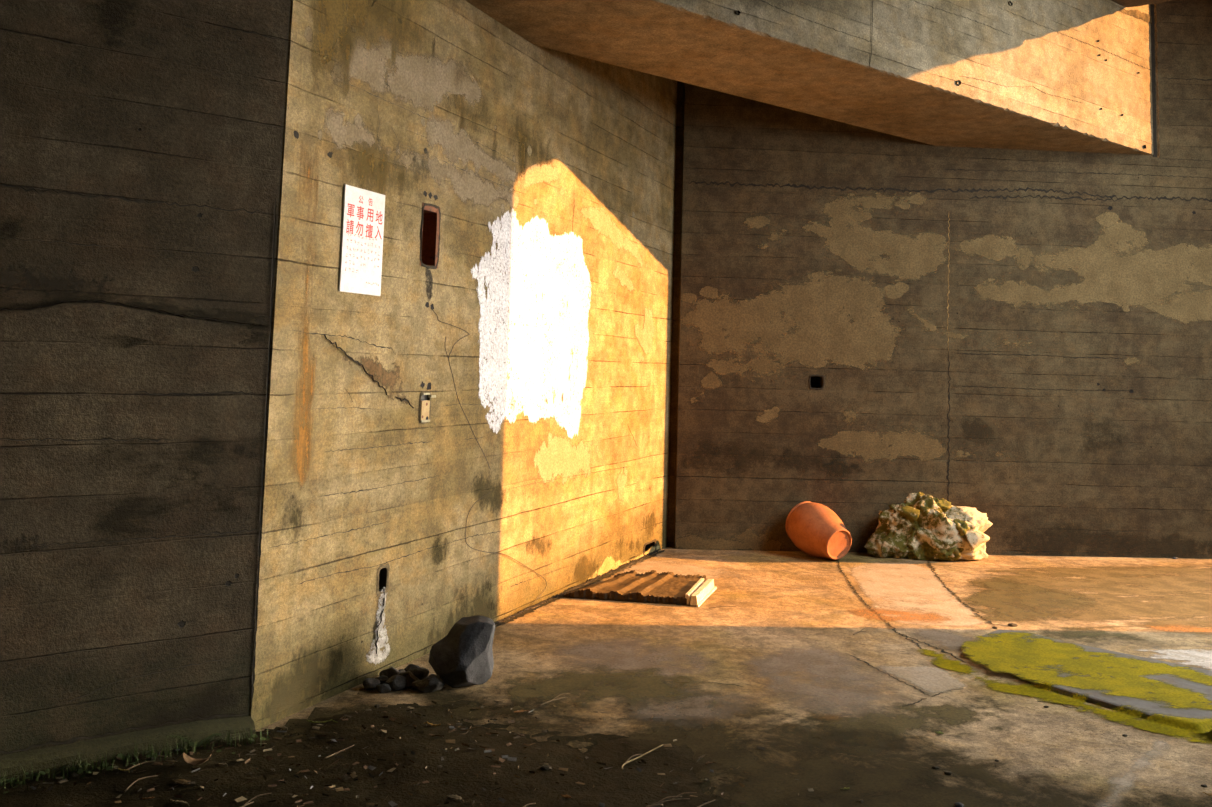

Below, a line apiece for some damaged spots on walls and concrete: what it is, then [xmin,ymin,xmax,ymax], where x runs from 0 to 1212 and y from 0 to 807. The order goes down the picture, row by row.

crack [0,299,264,326]
rust [291,314,314,487]
crack [293,330,392,349]
spalling [322,334,414,408]
peeling [755,406,780,423]
peeling [817,409,977,463]
peeling [681,190,1212,404]
crack [927,561,1006,626]
crack [836,559,966,707]